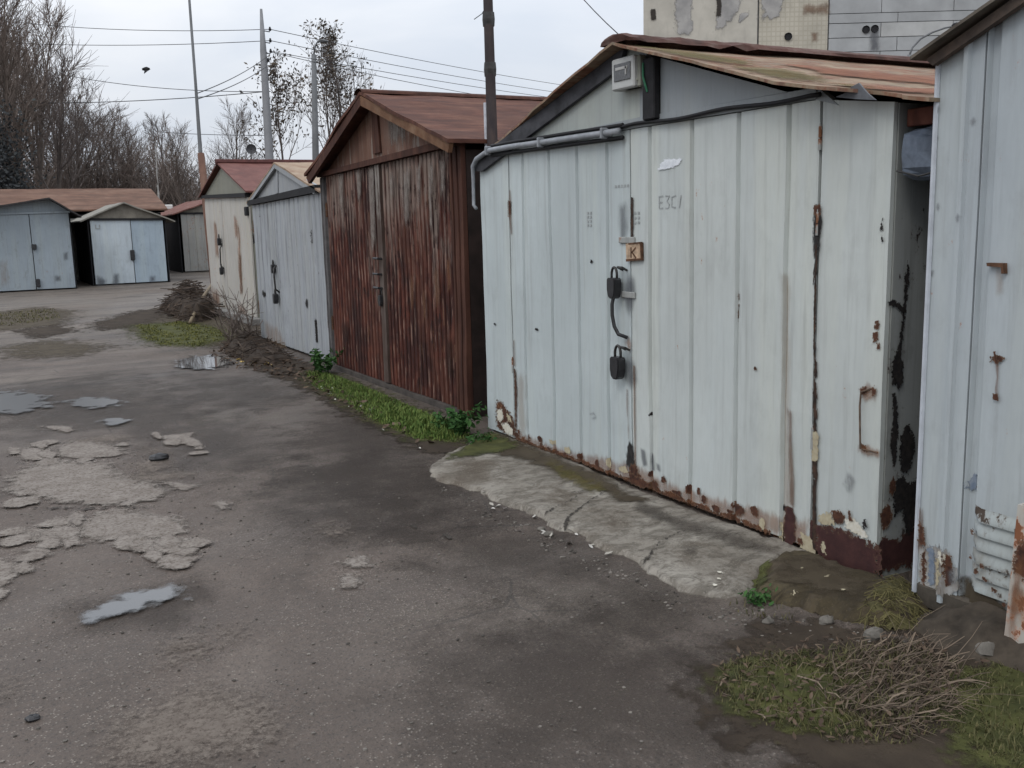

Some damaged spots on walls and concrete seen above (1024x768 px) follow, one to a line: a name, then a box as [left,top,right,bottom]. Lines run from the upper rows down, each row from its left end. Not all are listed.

spalling [674,0,693,35]
spalling [716,0,749,29]
rust [811,203,822,549]
peeling [495,400,771,535]
crack [545,483,618,531]
rust [1011,539,1024,582]
rust [960,577,1006,611]